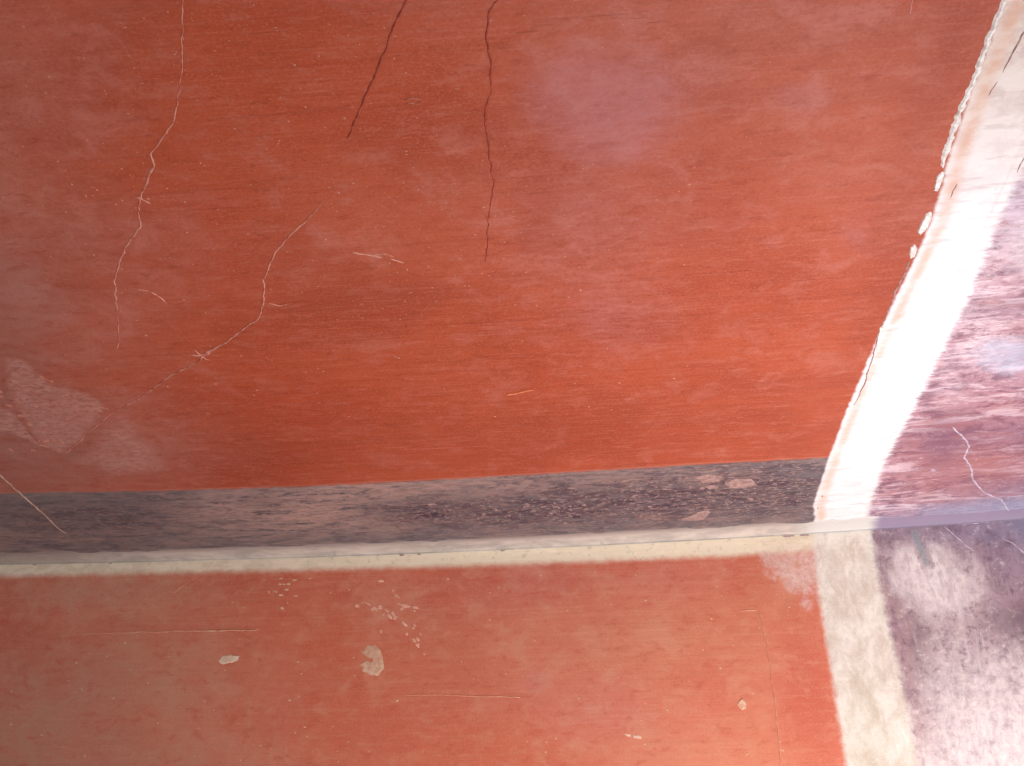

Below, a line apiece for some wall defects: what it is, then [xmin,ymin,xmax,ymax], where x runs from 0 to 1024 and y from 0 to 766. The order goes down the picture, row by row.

crack [113,0,184,349]
crack [347,0,408,139]
crack [484,0,498,261]
crack [64,198,326,455]
crack [0,474,66,534]
peeling [360,645,384,676]
peeling [355,580,422,648]